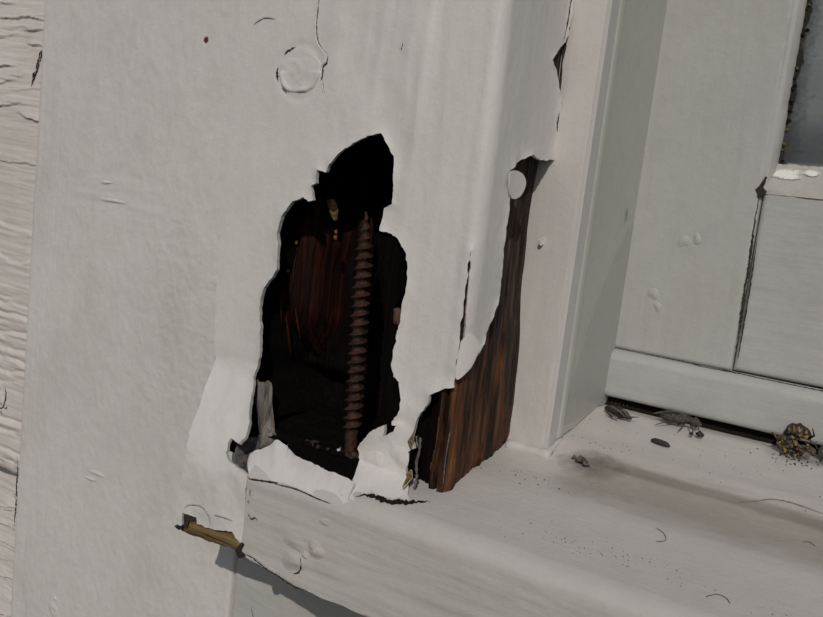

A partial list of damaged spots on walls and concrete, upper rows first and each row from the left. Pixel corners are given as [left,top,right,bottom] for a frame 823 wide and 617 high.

peeling [553,0,572,91]
peeling [393,308,401,324]
peeling [402,156,538,493]
peeling [235,436,261,463]
peeling [355,493,429,505]
spalling [175,514,245,558]